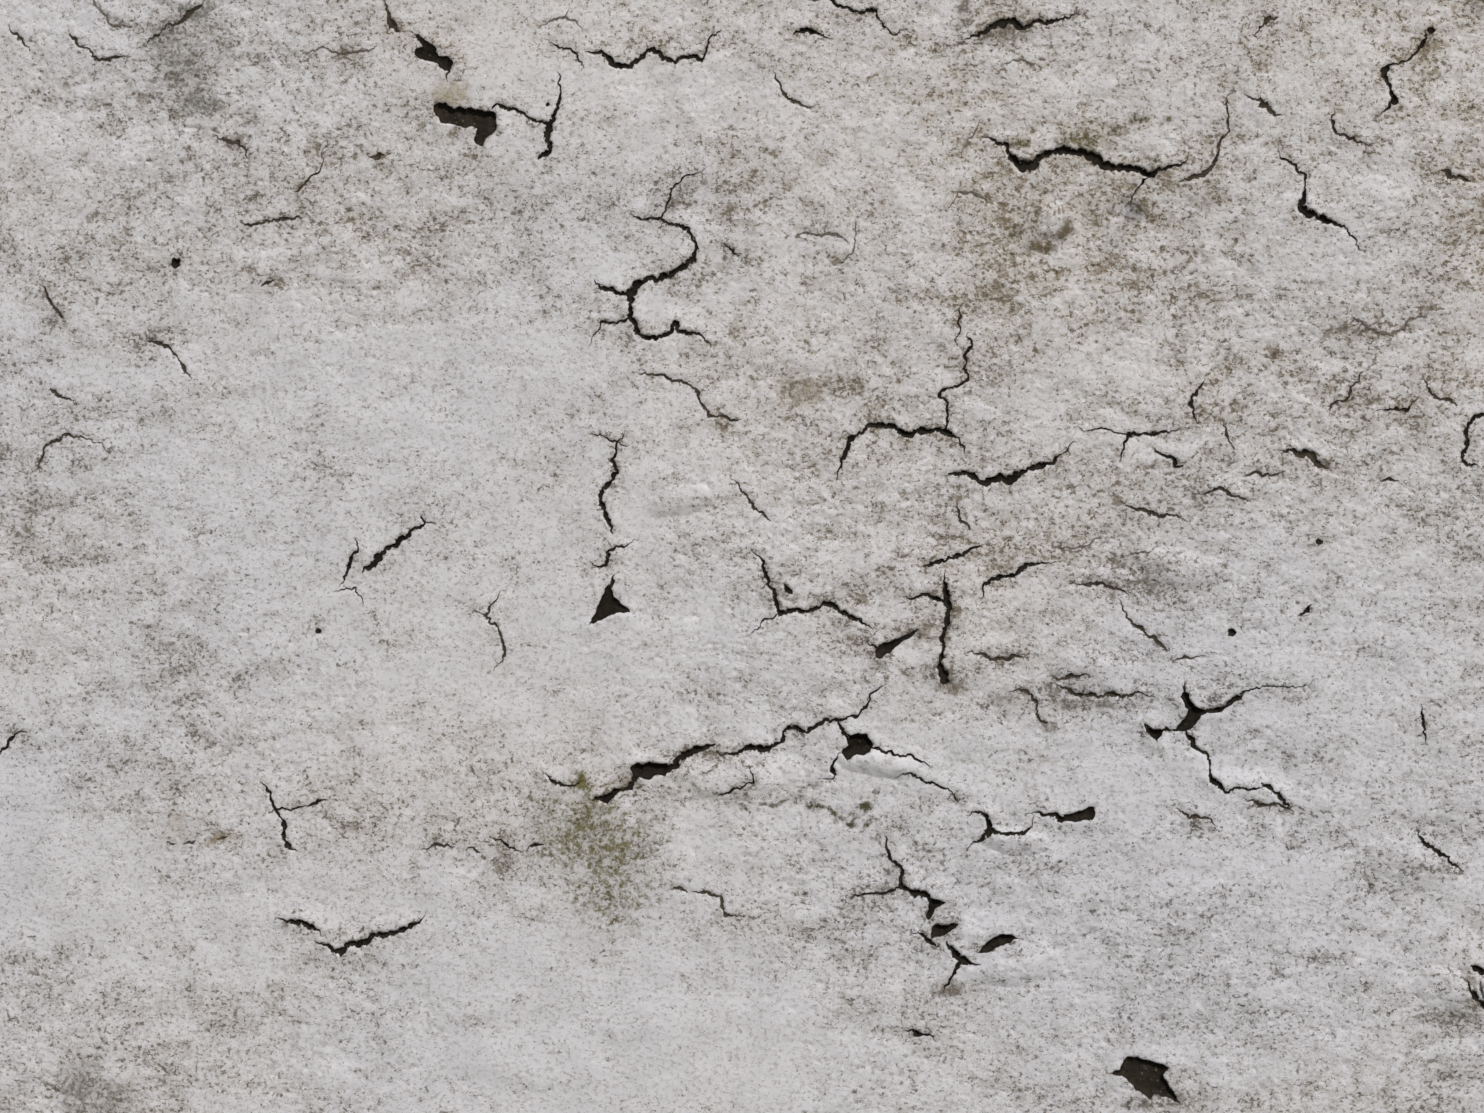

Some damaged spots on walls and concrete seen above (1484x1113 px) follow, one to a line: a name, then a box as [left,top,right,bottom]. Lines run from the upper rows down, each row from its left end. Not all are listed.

crack [492,0,722,159]
crack [961,93,1361,250]
crack [590,168,740,422]
crack [1351,313,1428,336]
crack [1329,369,1484,468]
crack [333,516,436,603]
crack [541,304,1331,851]
crack [262,782,326,851]
crack [275,914,426,957]
crack [672,886,743,917]
crack [850,836,1017,993]
spalling [1112,1056,1181,1103]